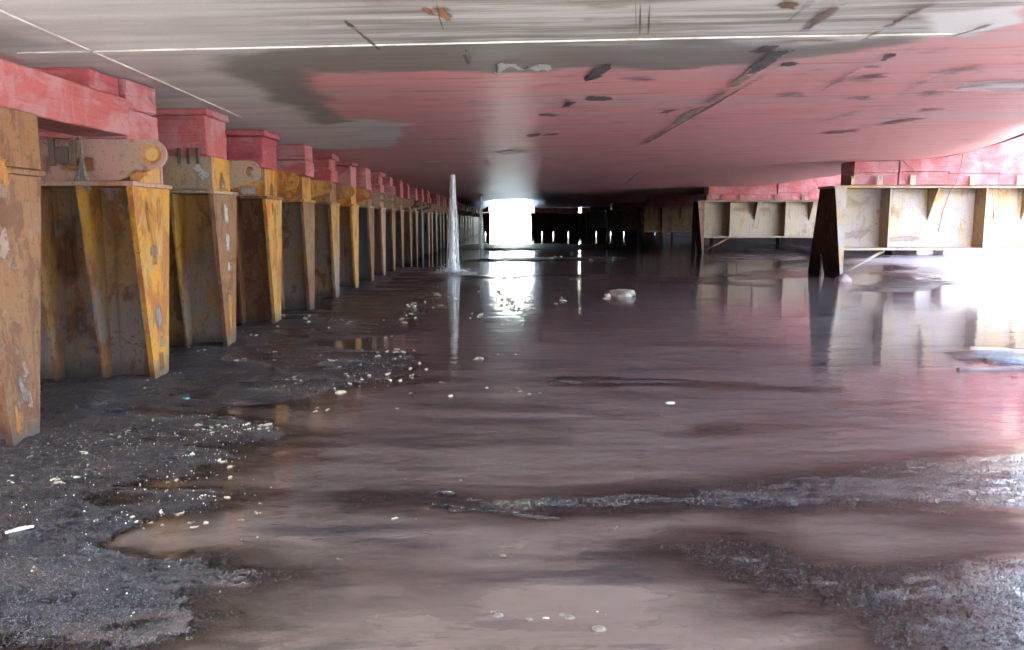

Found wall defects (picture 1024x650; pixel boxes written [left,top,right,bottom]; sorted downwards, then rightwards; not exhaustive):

peeling [492,63,553,76]
spalling [585,64,611,81]
rust [0,157,10,196]